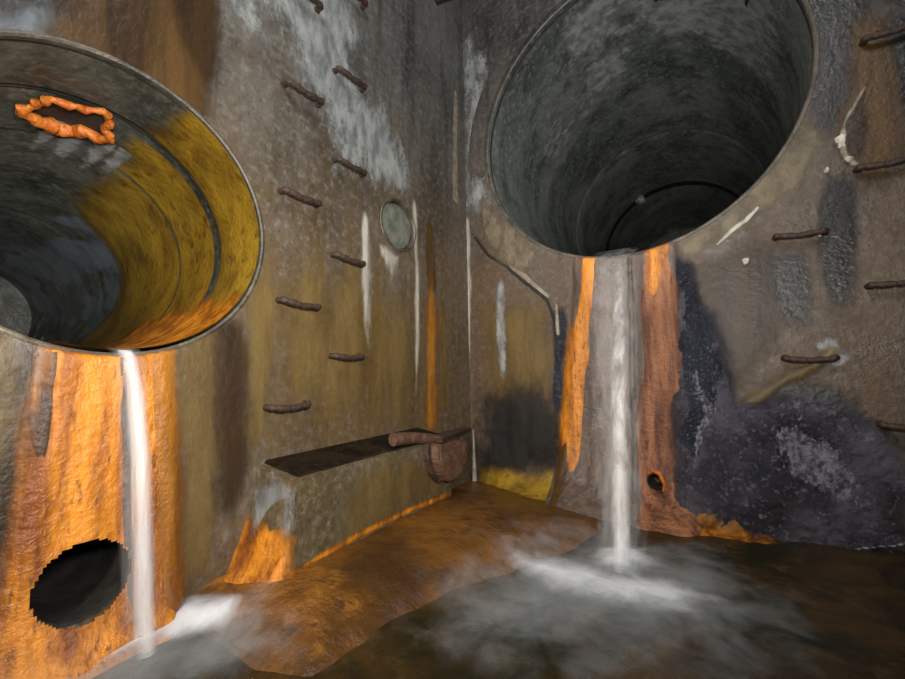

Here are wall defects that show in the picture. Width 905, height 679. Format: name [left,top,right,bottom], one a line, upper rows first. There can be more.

efflorescence [231,0,408,194]
damp [681,0,870,255]
rust [0,331,41,551]
damp [479,257,597,506]
damp [627,243,704,537]
damp [772,252,813,322]
damp [817,338,847,366]
damp [819,178,857,303]
rust [203,492,450,653]